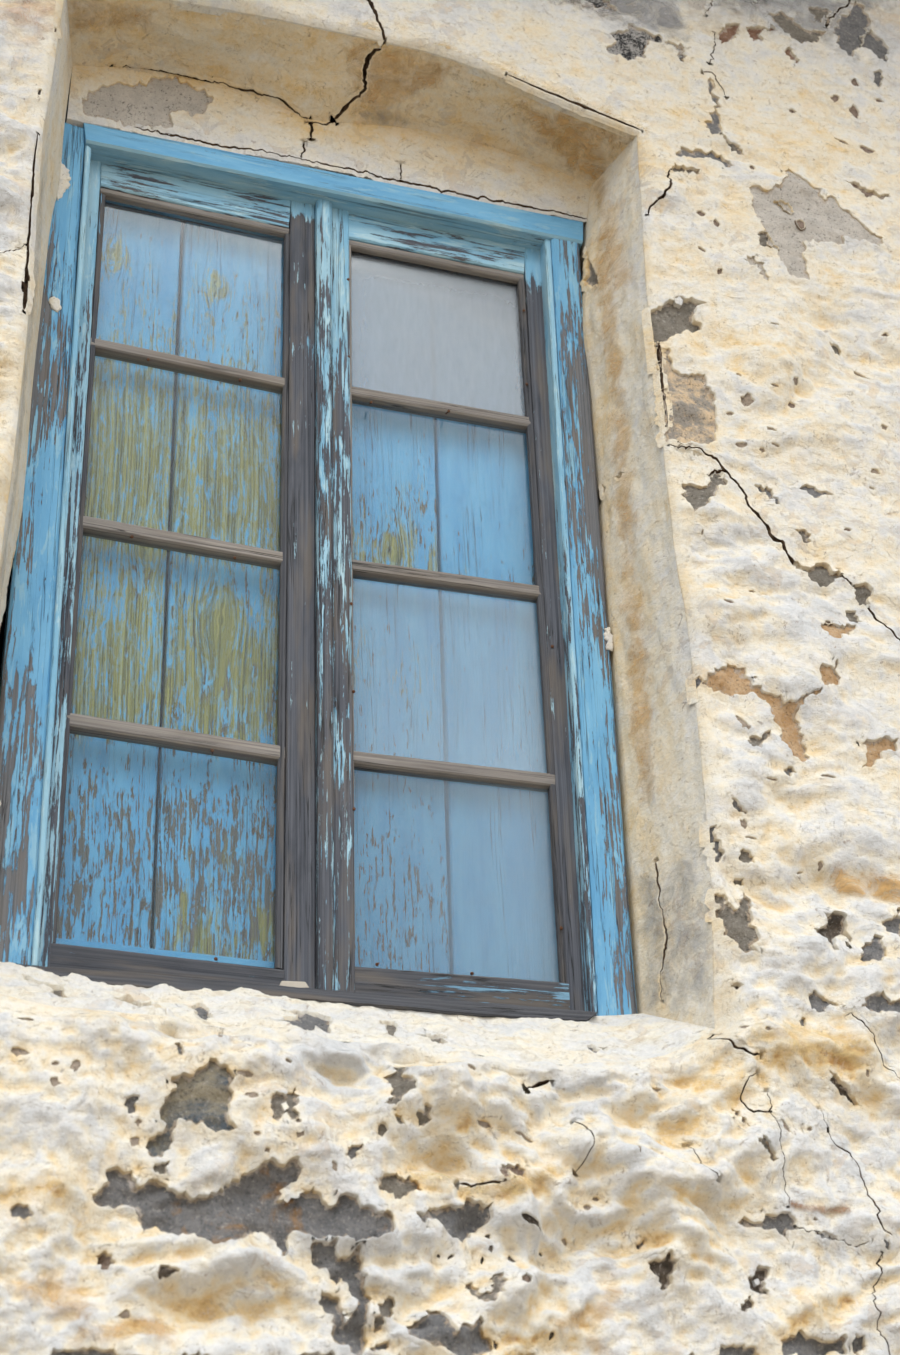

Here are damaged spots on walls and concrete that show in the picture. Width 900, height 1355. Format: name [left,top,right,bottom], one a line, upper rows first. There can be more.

crack [0,133,43,315]
crack [113,0,587,222]
crack [505,73,642,136]
spalling [574,0,692,67]
crack [641,168,677,215]
spalling [665,73,896,286]
spalling [681,0,895,124]
crack [652,341,803,571]
spalling [642,291,880,788]
spalling [699,790,768,997]
spalling [84,990,574,1355]
crack [700,1033,896,1355]